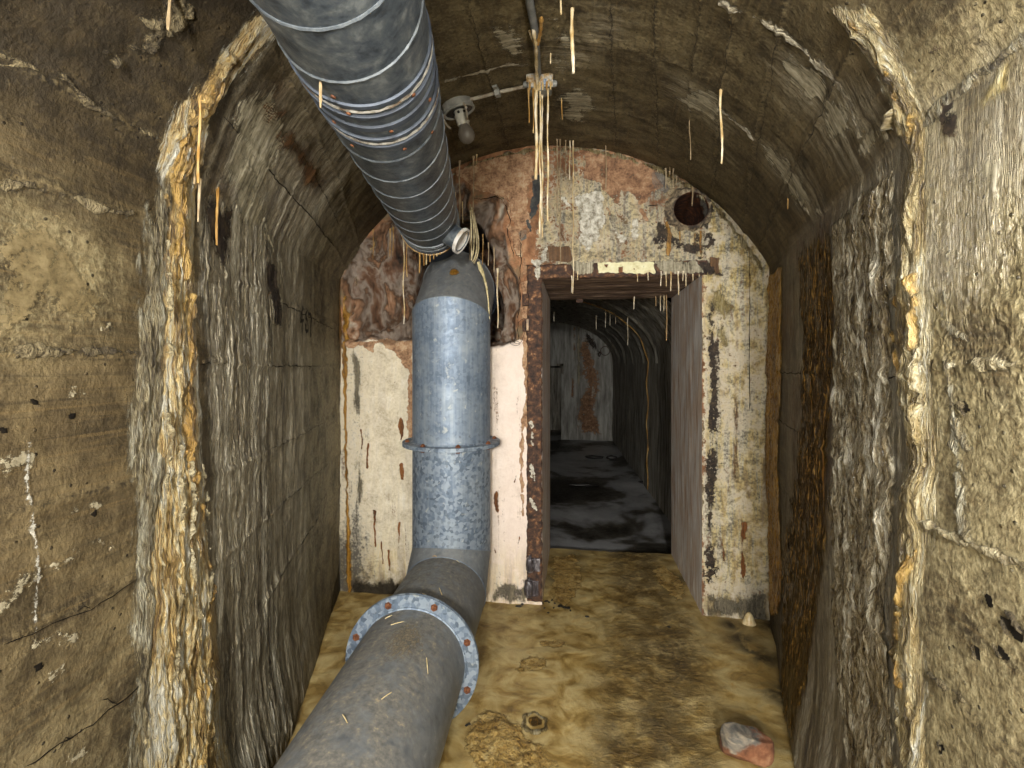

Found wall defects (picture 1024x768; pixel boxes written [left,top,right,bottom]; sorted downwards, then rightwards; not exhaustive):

peeling [561,151,661,252]
peeling [598,261,656,274]
rust [373,510,401,570]
crack [4,579,137,645]